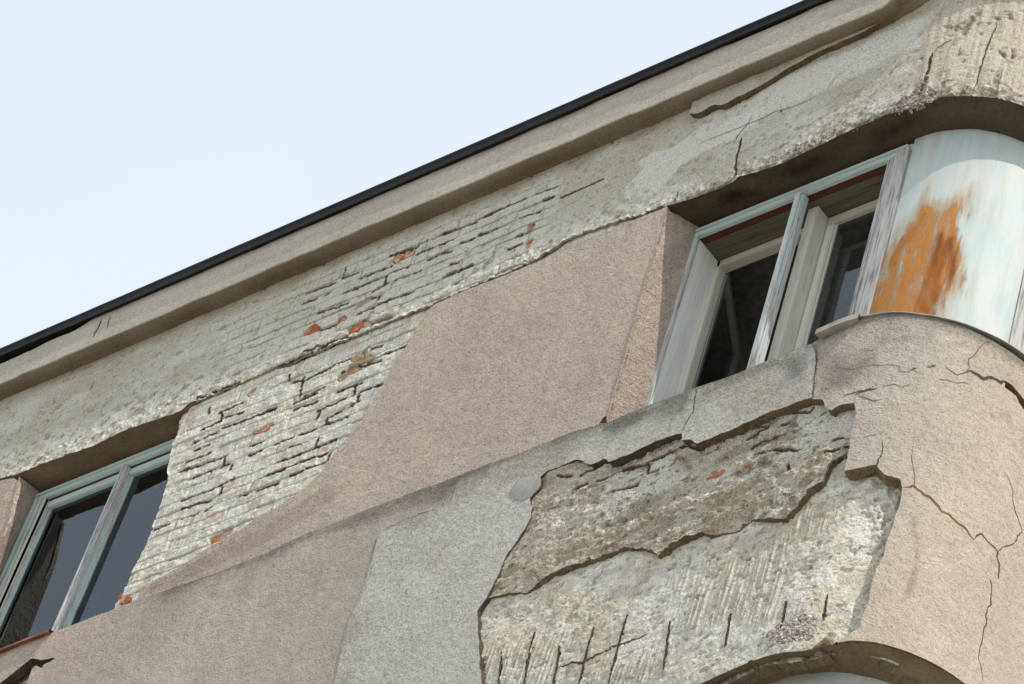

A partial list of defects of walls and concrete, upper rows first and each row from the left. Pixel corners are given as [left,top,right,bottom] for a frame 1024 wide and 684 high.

crack [918,40,951,97]
crack [974,22,1003,94]
crack [699,96,816,177]
peeling [0,0,1024,478]
rust [871,200,969,315]
crack [812,341,1004,401]
peeling [113,307,430,610]
spalling [480,405,901,684]
crack [904,447,1023,683]